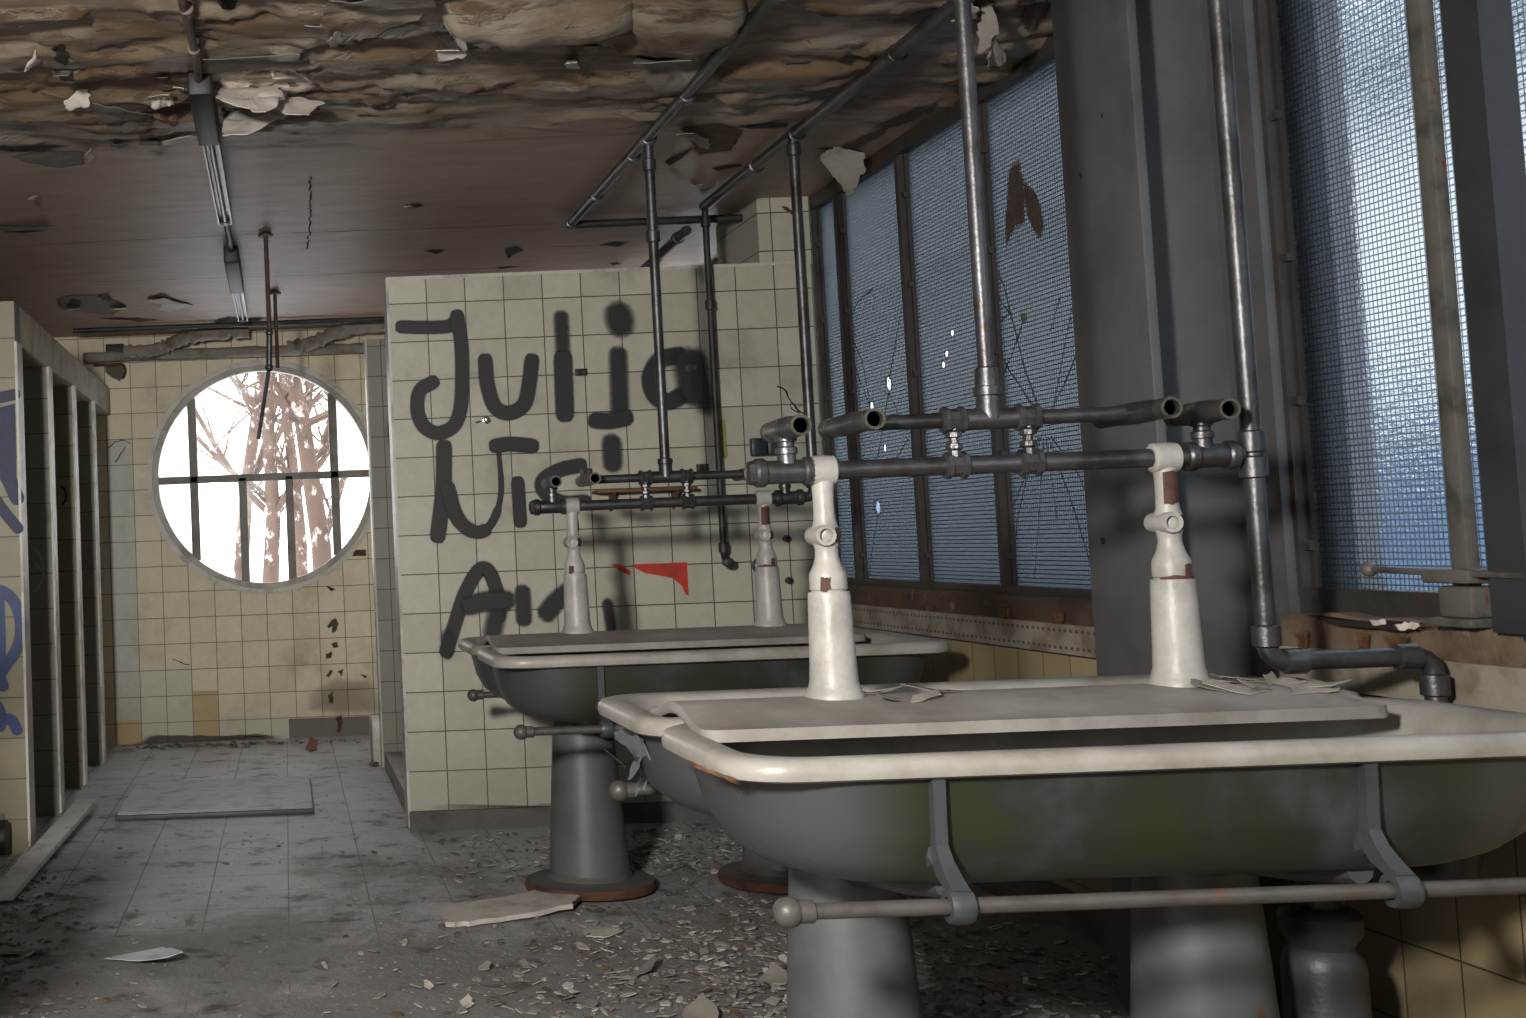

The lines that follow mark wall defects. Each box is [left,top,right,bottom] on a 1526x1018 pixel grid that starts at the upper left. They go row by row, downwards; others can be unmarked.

peeling [217,0,238,10]
peeling [305,0,495,61]
peeling [564,38,609,69]
peeling [950,0,1006,70]
peeling [0,44,197,168]
flaking render [202,53,325,136]